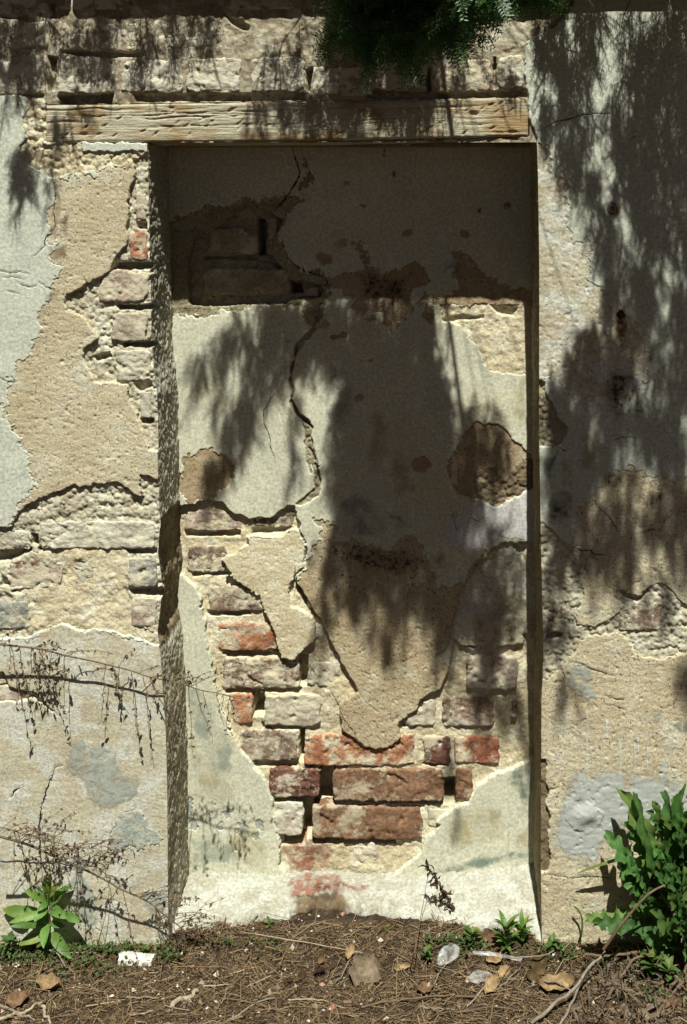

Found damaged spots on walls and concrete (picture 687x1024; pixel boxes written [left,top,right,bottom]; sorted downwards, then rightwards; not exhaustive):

flaking render [0,0,574,946]
crack [263,147,328,508]